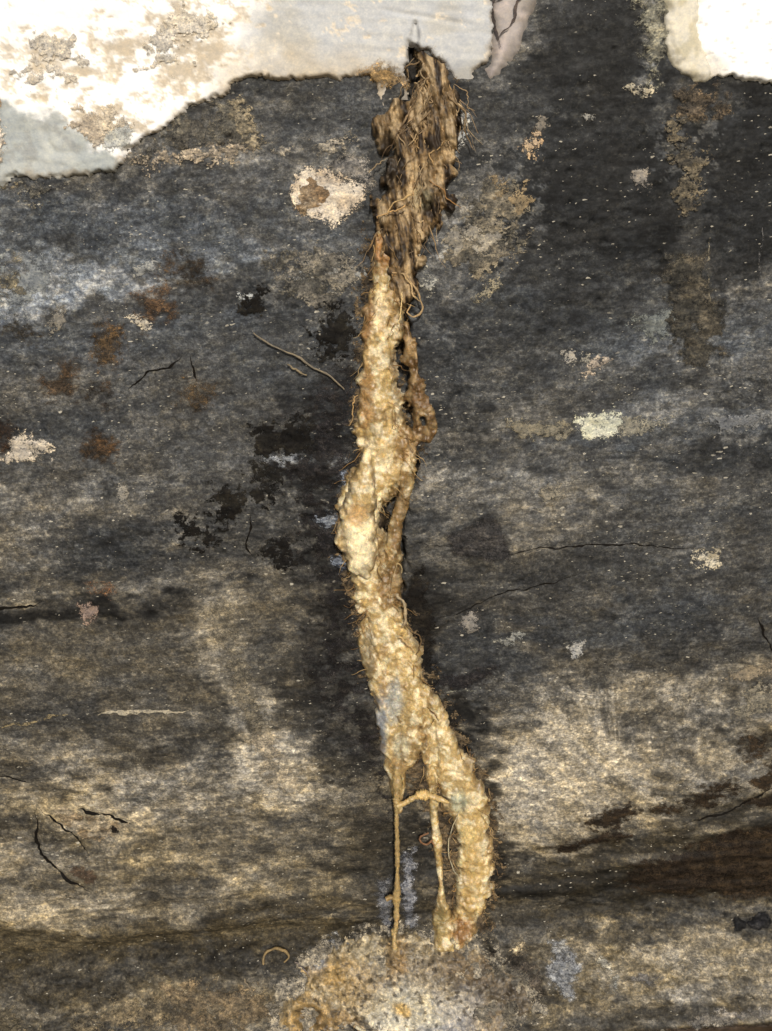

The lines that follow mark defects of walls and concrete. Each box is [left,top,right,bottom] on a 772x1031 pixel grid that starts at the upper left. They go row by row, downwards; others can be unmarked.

flaking render [696,0,772,84]
flaking render [0,0,536,188]
damp [327,152,376,192]
crack [509,543,707,555]
damp [171,220,583,1031]
crack [441,573,580,617]
damp [550,763,772,853]
crack [34,808,131,893]
damp [616,825,772,903]
damp [596,957,664,989]